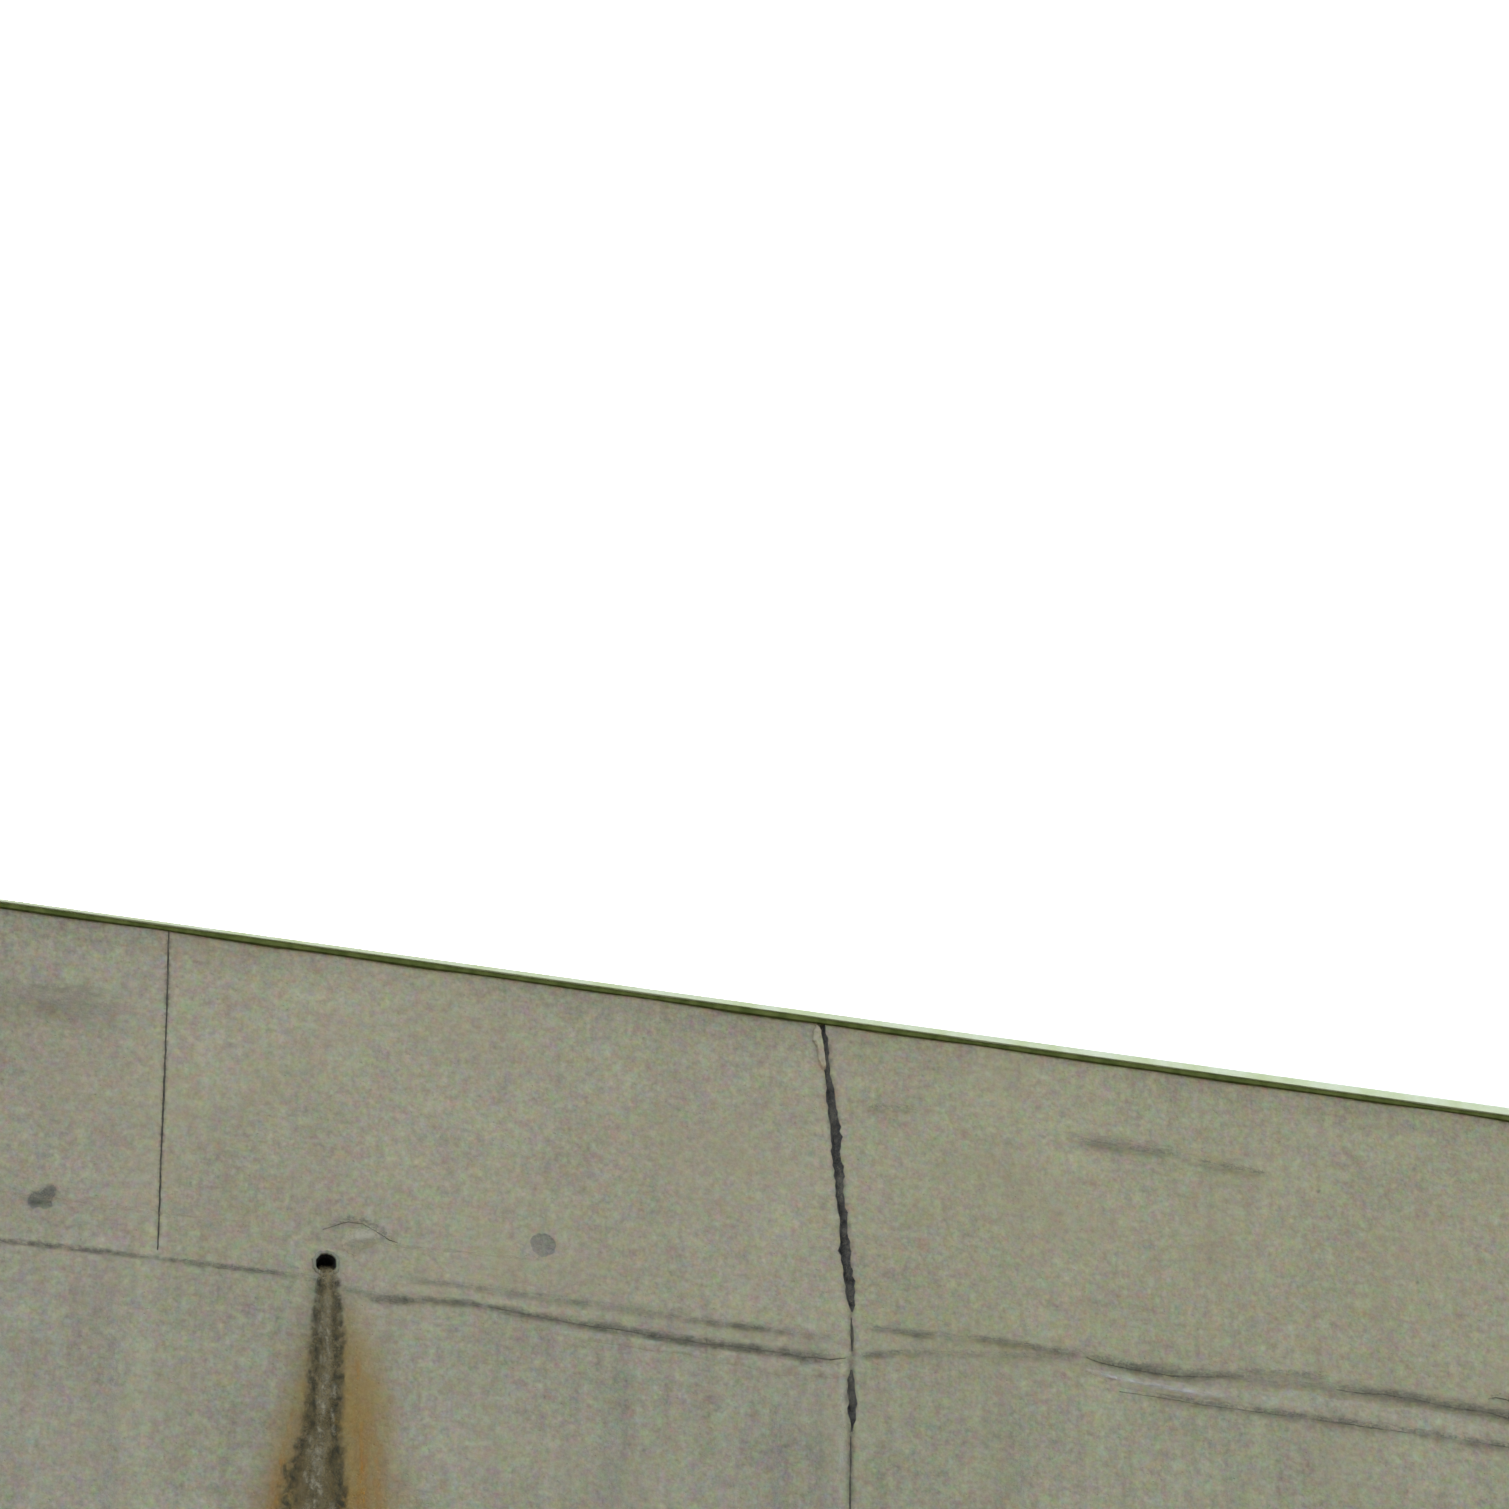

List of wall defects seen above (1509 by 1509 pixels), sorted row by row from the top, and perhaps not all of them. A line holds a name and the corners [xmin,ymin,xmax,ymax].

crack [361,1025,929,1509]
leakage [281,1269,347,1509]
crack [968,1336,1509,1448]